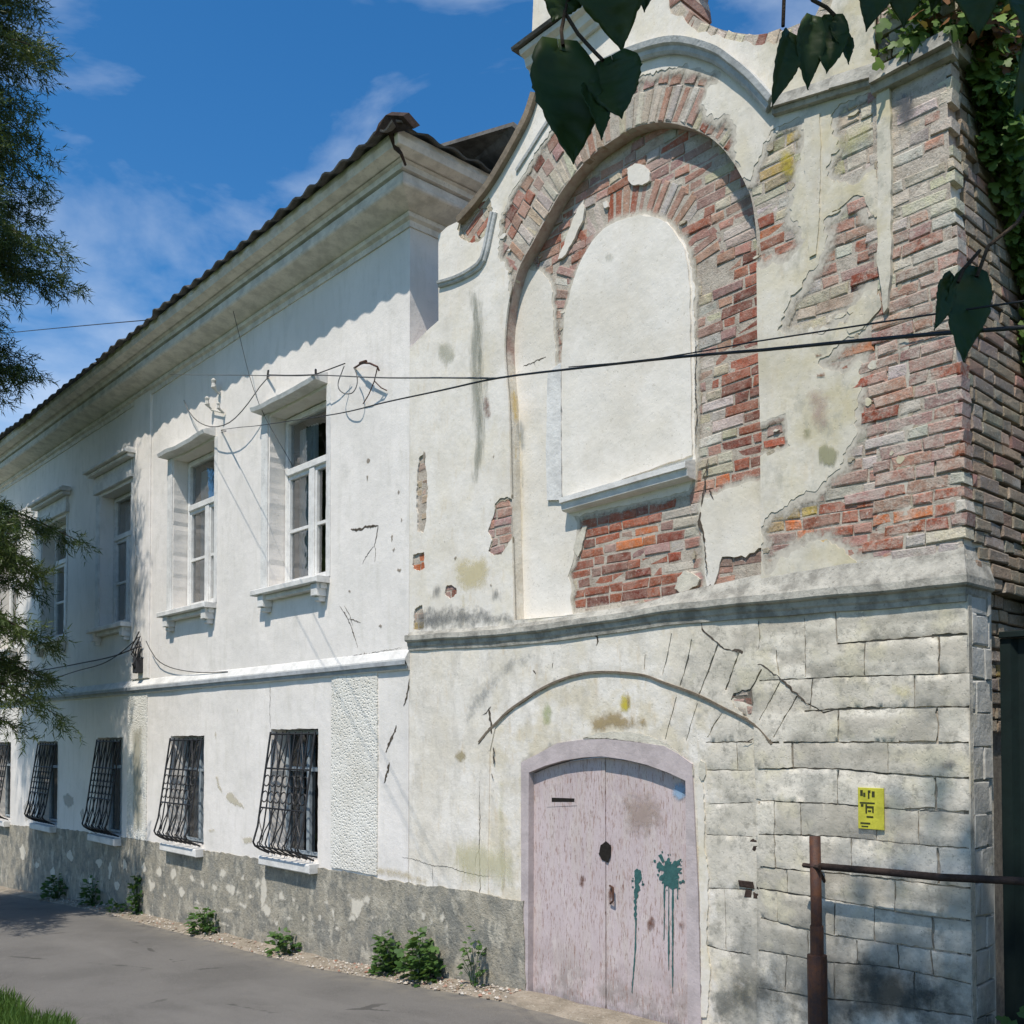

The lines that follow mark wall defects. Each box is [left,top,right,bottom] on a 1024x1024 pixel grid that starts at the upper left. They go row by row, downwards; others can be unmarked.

leakage [472,300,484,466]
flaking render [460,63,914,614]
flaking render [417,452,428,520]
crack [351,525,378,562]
crack [340,607,398,657]
crack [701,623,809,705]
crack [384,682,409,783]
crack [403,708,495,893]